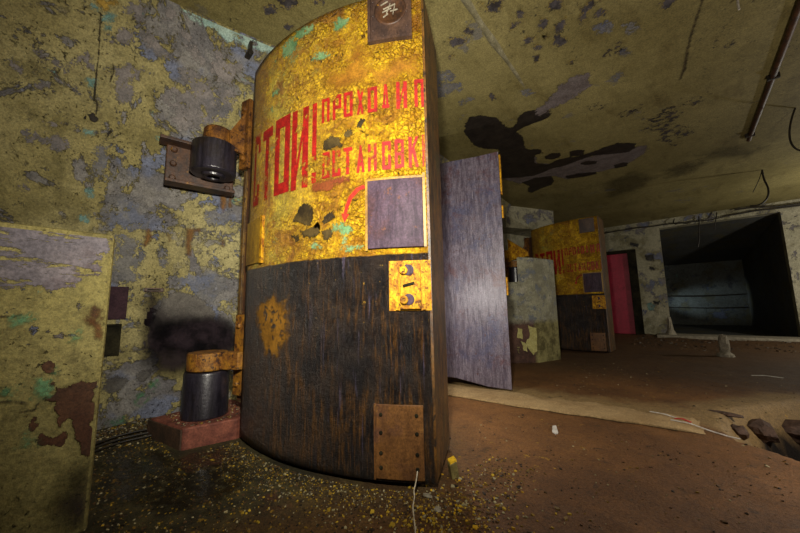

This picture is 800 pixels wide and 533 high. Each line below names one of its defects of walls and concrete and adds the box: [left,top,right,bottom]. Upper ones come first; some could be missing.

spalling [477,0,504,13]
spalling [523,0,569,64]
peeling [578,0,641,57]
peeling [91,0,314,132]
peeling [437,26,476,105]
spalling [535,73,593,116]
spalling [502,145,647,184]
peeling [0,193,149,291]
peeling [291,203,364,252]
flaking render [147,254,229,342]
corrosion [256,296,290,356]
peeling [28,360,152,457]